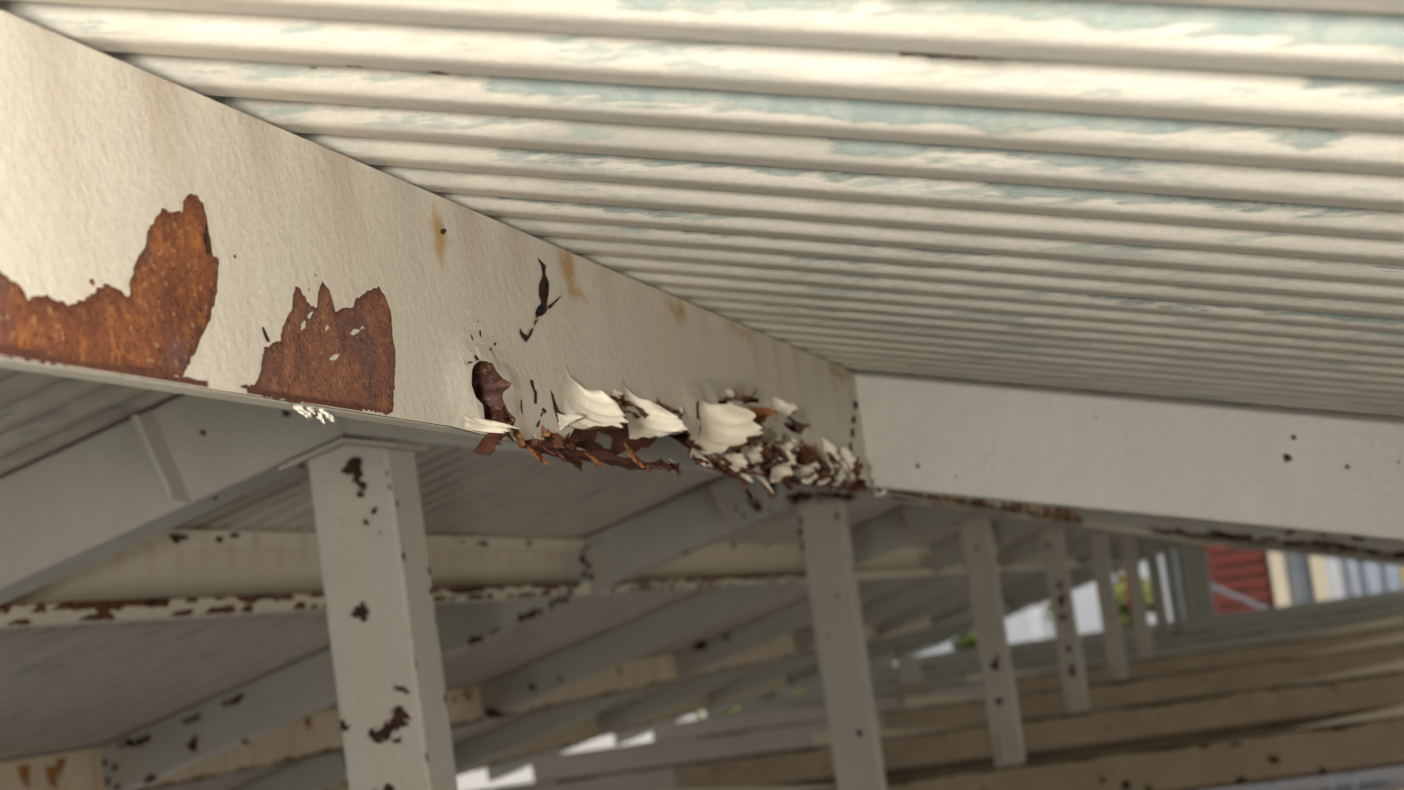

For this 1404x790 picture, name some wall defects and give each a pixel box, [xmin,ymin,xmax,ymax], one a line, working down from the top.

rust [0,189,236,387]
rust [238,274,397,418]
peeling [465,363,869,506]